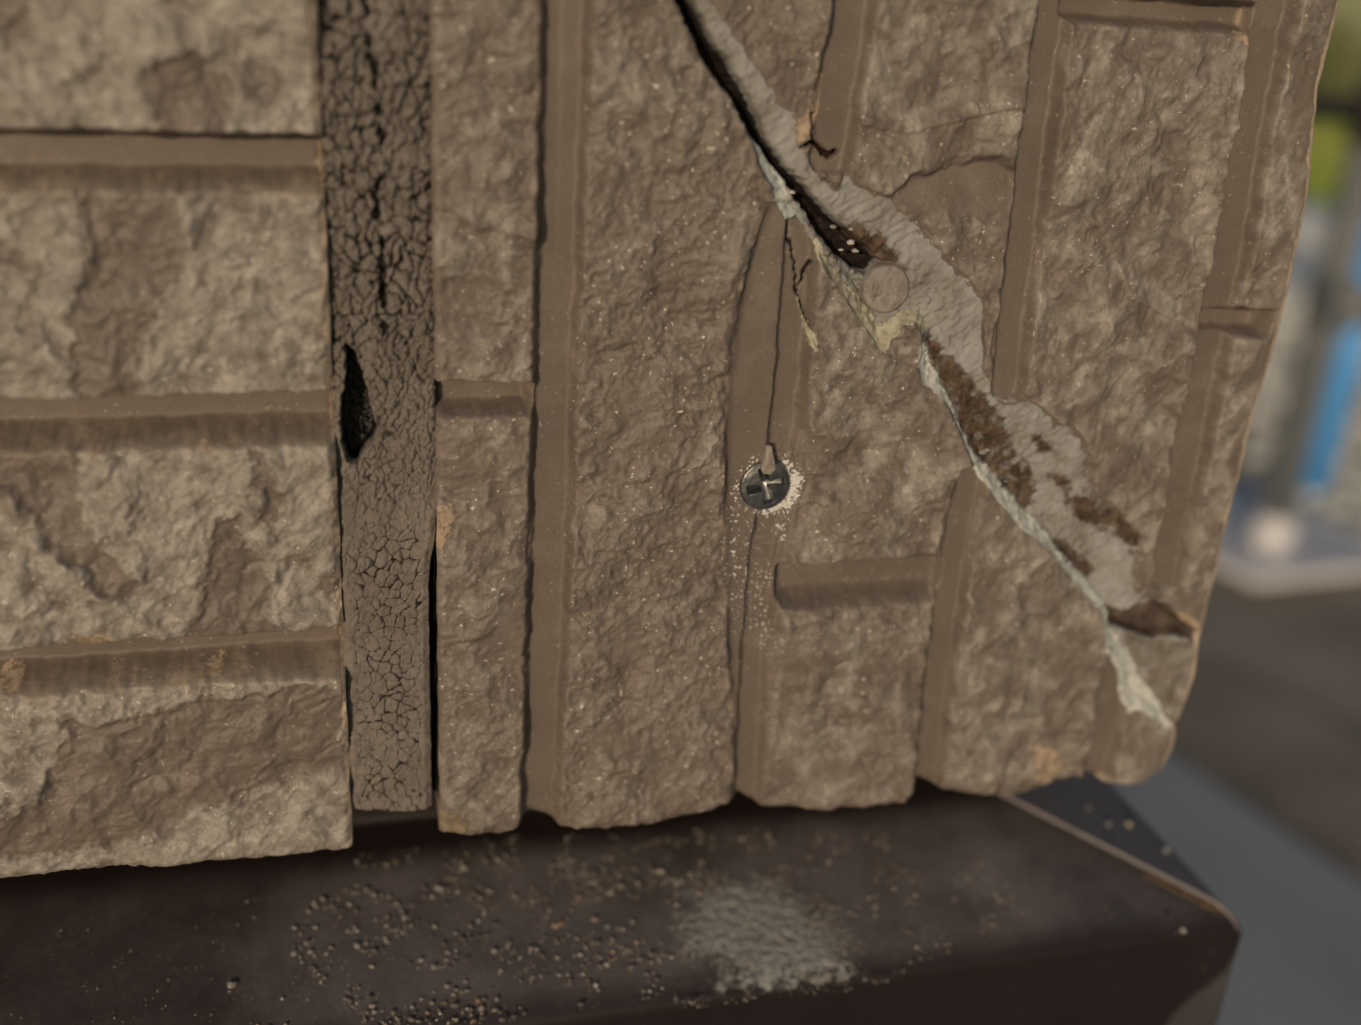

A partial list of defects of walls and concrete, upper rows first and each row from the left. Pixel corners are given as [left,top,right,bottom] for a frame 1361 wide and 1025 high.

crack [317,0,434,397]
crack [345,431,423,810]
peeling [760,444,775,475]
peeling [790,70,823,143]
crack [674,0,1190,731]